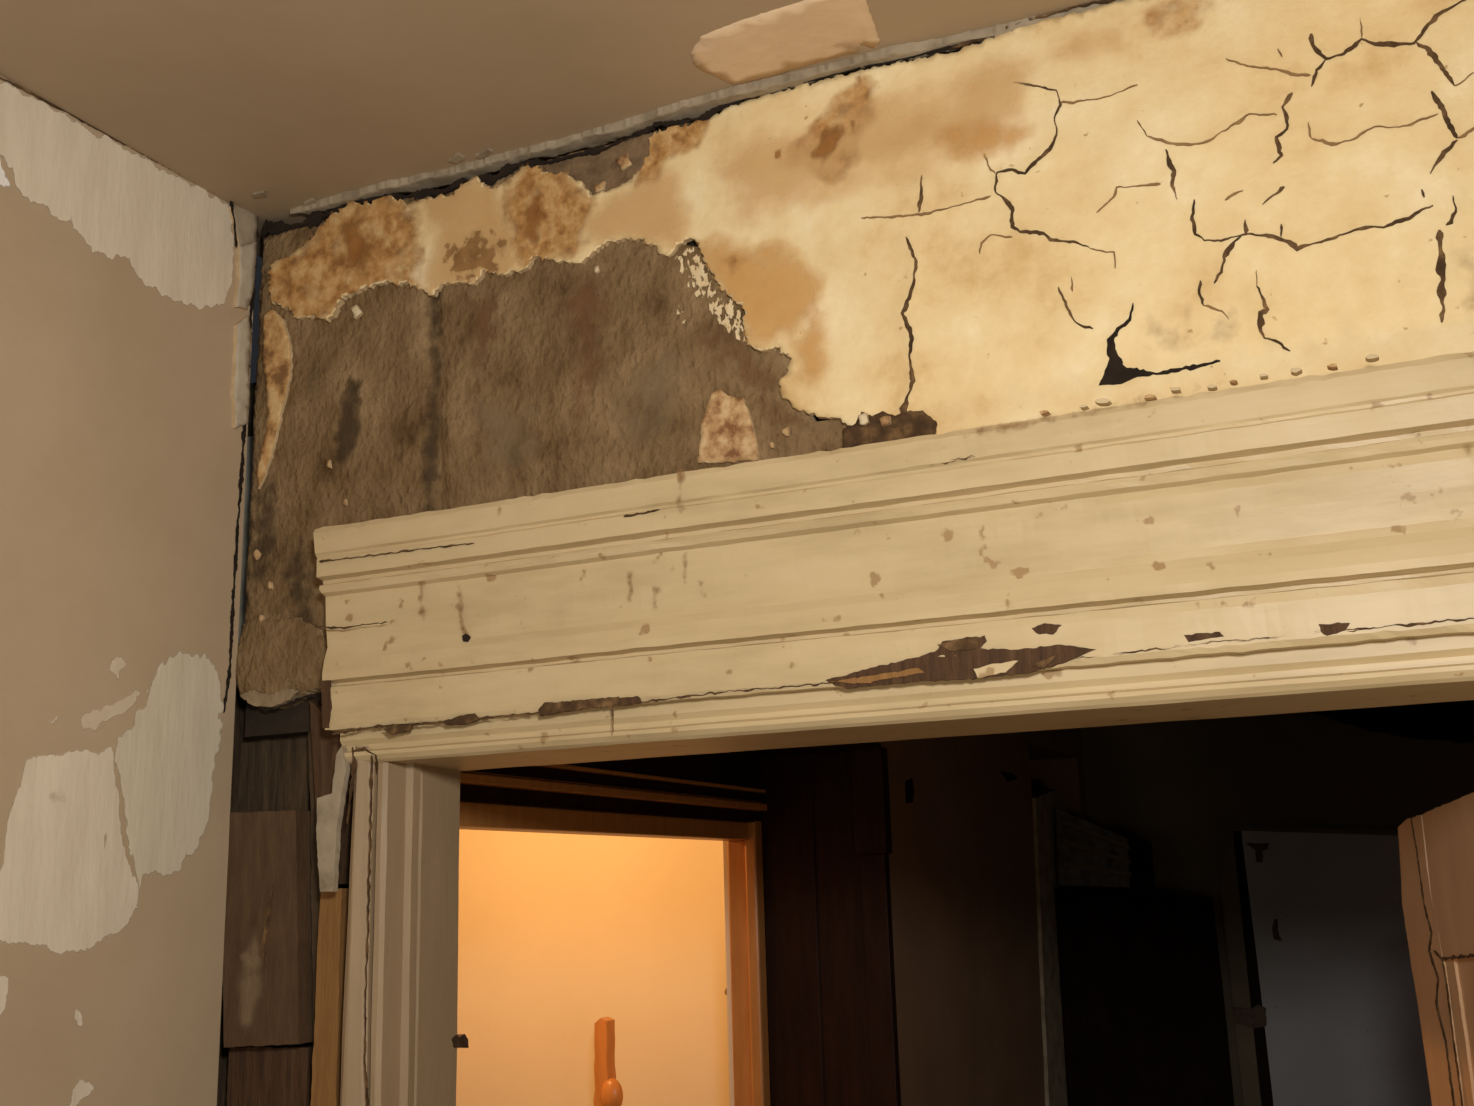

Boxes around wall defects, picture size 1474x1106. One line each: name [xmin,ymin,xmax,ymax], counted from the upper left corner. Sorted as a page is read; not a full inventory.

peeling [0,82,235,310]
leakage [429,183,509,291]
flaking render [245,0,1124,635]
leakage [742,72,1019,195]
crack [861,0,1474,413]
peeling [0,651,224,955]
peeling [320,680,332,728]
peeling [826,623,1096,689]